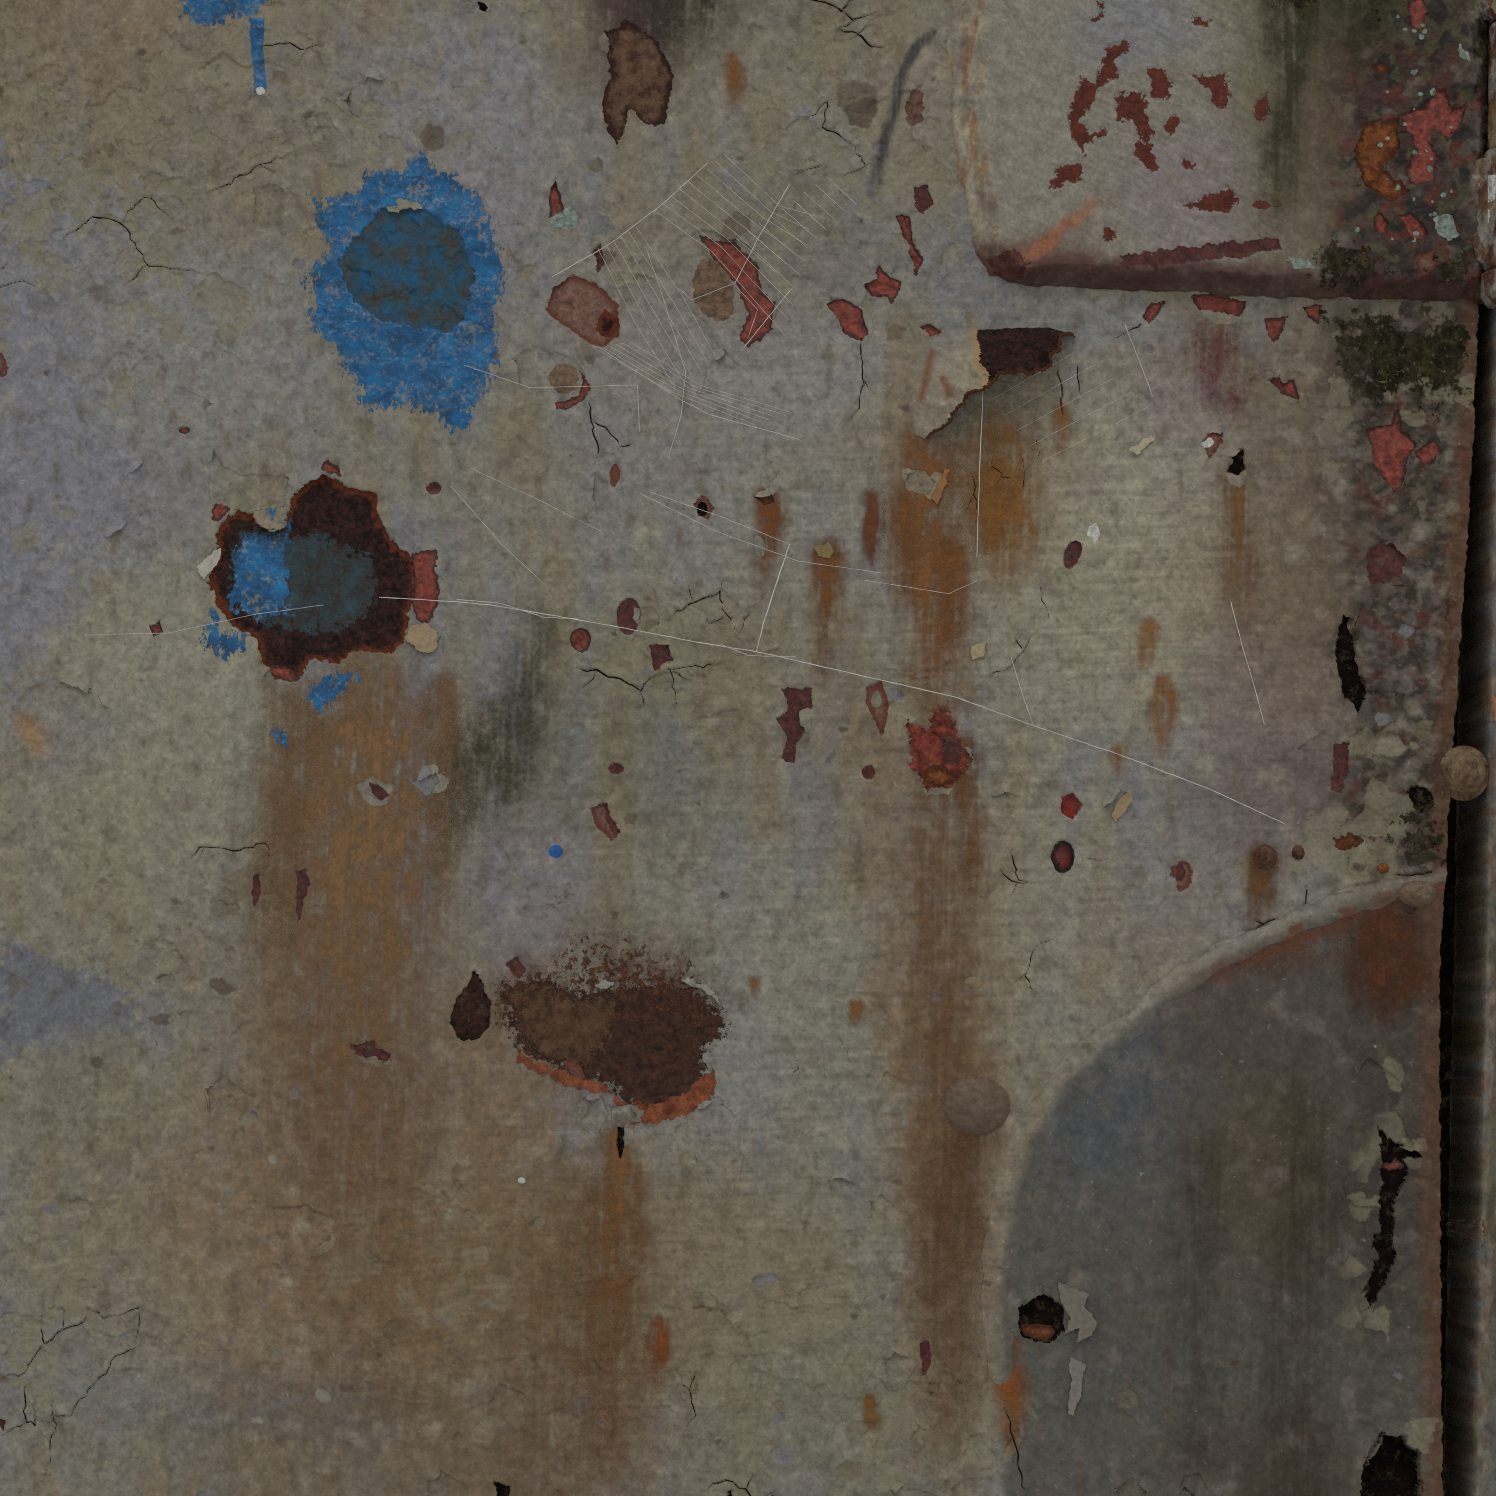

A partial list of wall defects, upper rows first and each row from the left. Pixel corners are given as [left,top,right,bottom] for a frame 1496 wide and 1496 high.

peeling [599,19,674,145]
crack [812,0,881,48]
crack [66,197,188,280]
corrosion [968,425,1035,561]
peeling [197,548,221,579]
peeling [405,622,446,653]
corrosion [863,435,967,703]
peeling [1336,537,1451,724]
peeling [1331,741,1357,794]
corrosion [450,932,733,1365]
crack [12,1307,140,1471]
peeling [1008,1282,1097,1416]